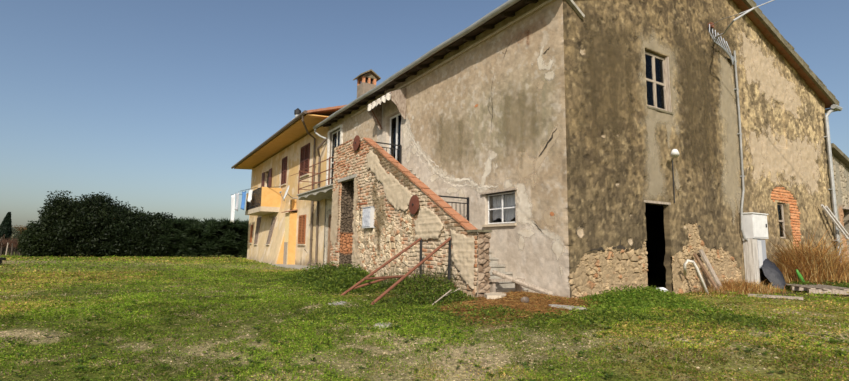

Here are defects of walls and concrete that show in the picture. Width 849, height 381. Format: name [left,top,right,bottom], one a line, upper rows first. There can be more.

flaking render [531,46,554,89]
peeling [351,177,370,270]
flaking render [366,151,413,211]
flaking render [401,116,648,298]